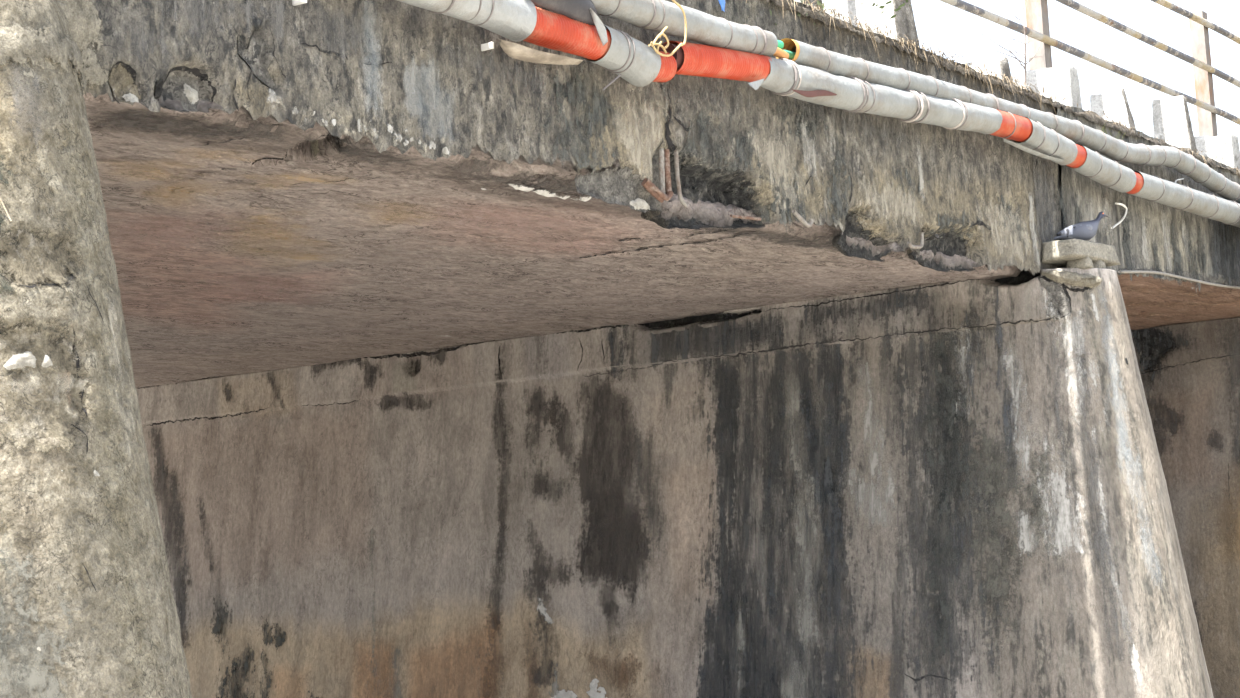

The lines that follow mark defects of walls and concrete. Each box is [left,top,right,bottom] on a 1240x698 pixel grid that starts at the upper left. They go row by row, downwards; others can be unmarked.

spalling [108,63,213,113]
spalling [575,101,799,230]
crack [569,228,755,260]
spalling [832,182,976,273]
spalling [985,203,1072,320]
crack [147,408,267,426]
crack [338,340,502,375]
crack [557,276,1089,377]
water stain [1131,326,1197,454]
water stain [151,423,192,647]
water stain [524,280,1141,698]
water stain [210,597,286,698]